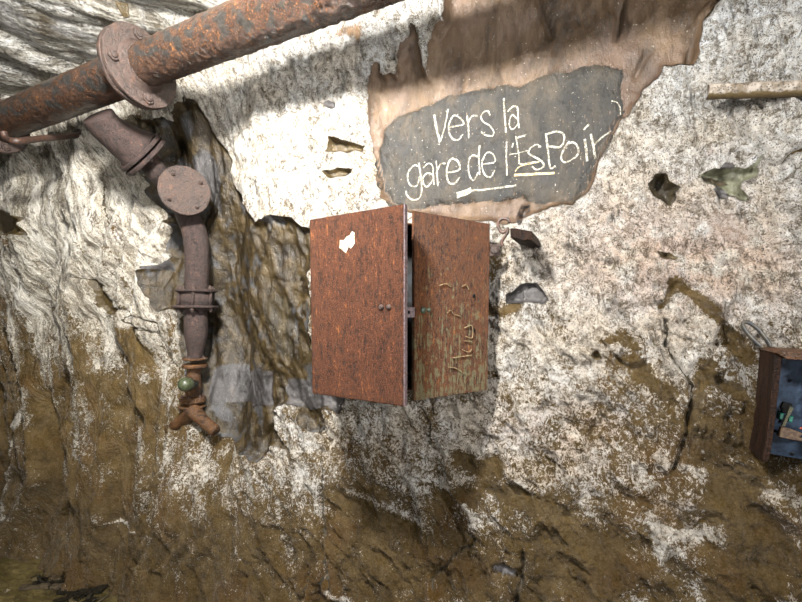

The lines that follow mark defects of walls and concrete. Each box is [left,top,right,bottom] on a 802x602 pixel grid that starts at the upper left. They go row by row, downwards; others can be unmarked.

peeling [125,98,345,462]
peeling [322,0,720,225]